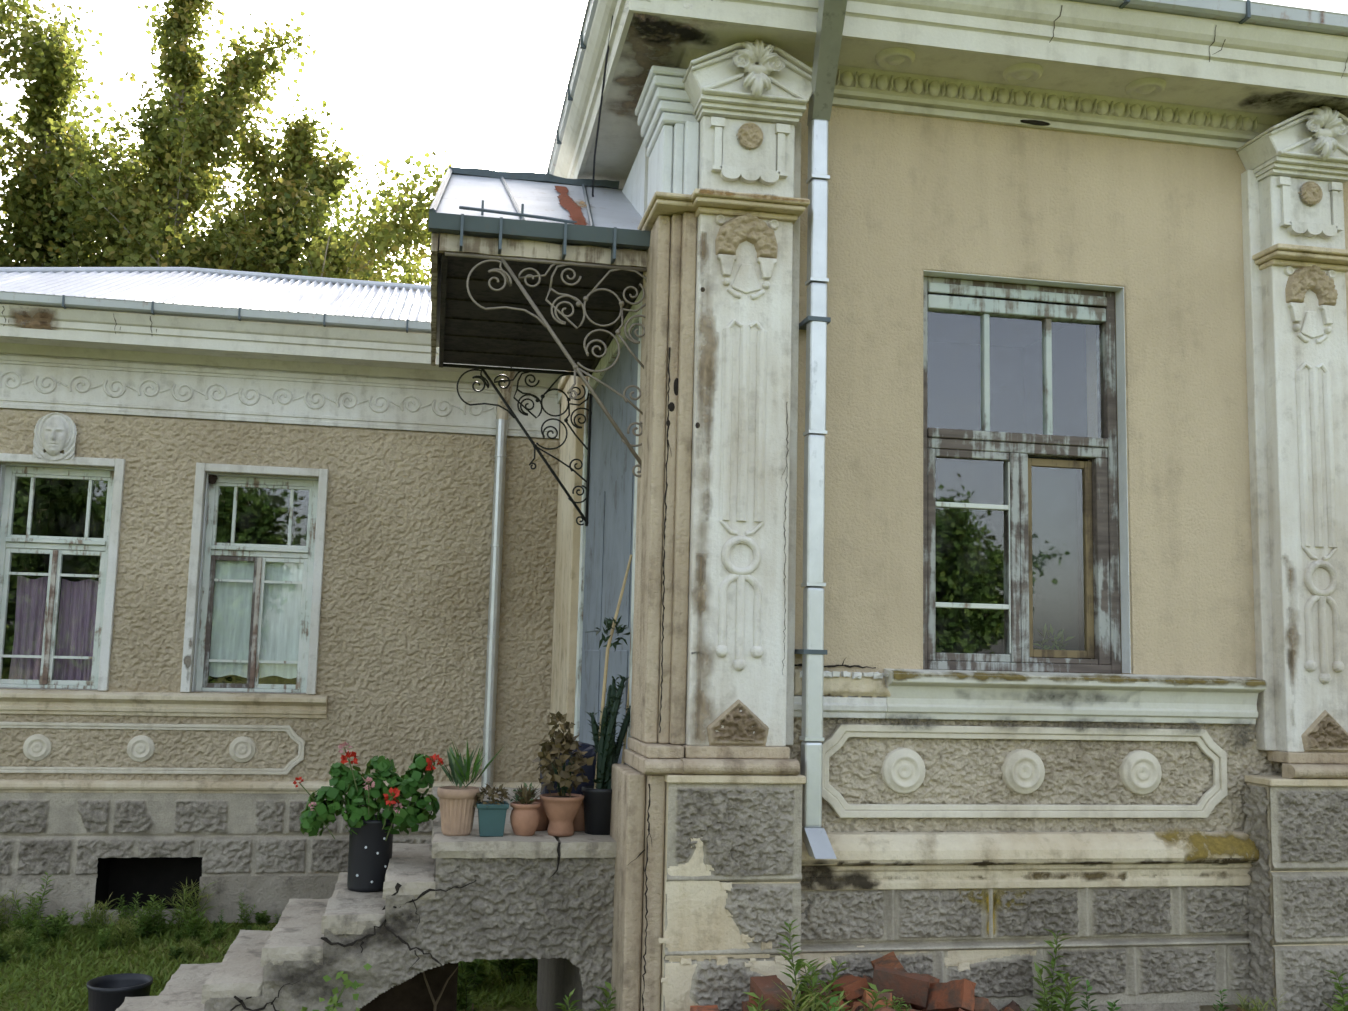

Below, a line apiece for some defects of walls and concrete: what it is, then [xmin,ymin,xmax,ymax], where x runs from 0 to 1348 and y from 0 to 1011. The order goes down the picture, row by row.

damp [610,13,710,115]
damp [1242,91,1348,114]
damp [698,289,717,453]
damp [695,555,707,613]
damp [694,645,712,742]